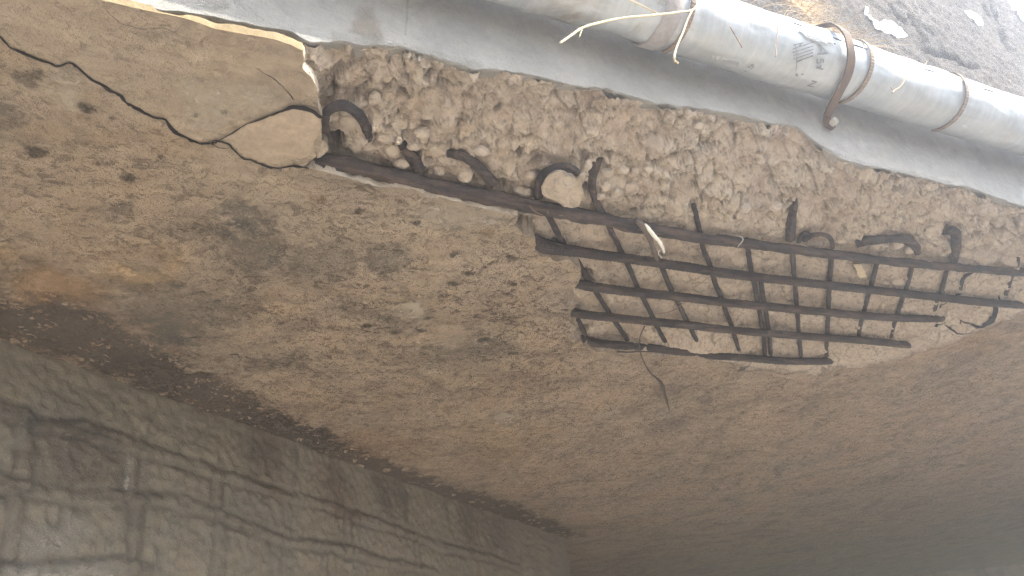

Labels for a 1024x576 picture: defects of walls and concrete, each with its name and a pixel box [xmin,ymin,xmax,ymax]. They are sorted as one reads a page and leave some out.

crack [0,36,322,169]
spalling [299,44,1024,376]
damp [0,293,581,537]